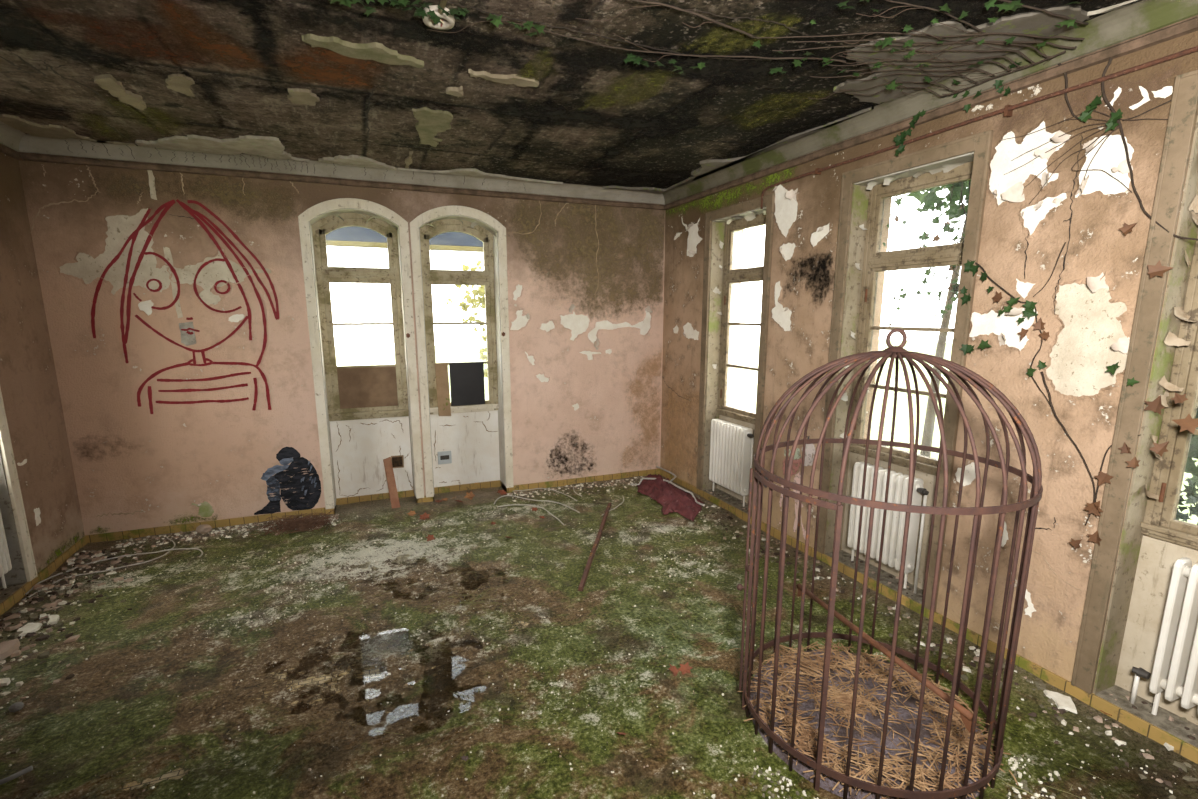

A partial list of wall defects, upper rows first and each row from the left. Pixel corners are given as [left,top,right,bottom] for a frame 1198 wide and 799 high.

spalling [0,107,563,184]
water stain [0,0,827,187]
water stain [724,102,878,158]
spalling [603,0,1141,194]
peeling [987,118,1139,239]
peeling [1129,86,1173,110]
peeling [57,206,274,318]
peeling [727,184,832,264]
water stain [787,254,835,303]
spalling [969,270,1134,400]
crack [336,413,498,497]
water stain [549,435,593,474]